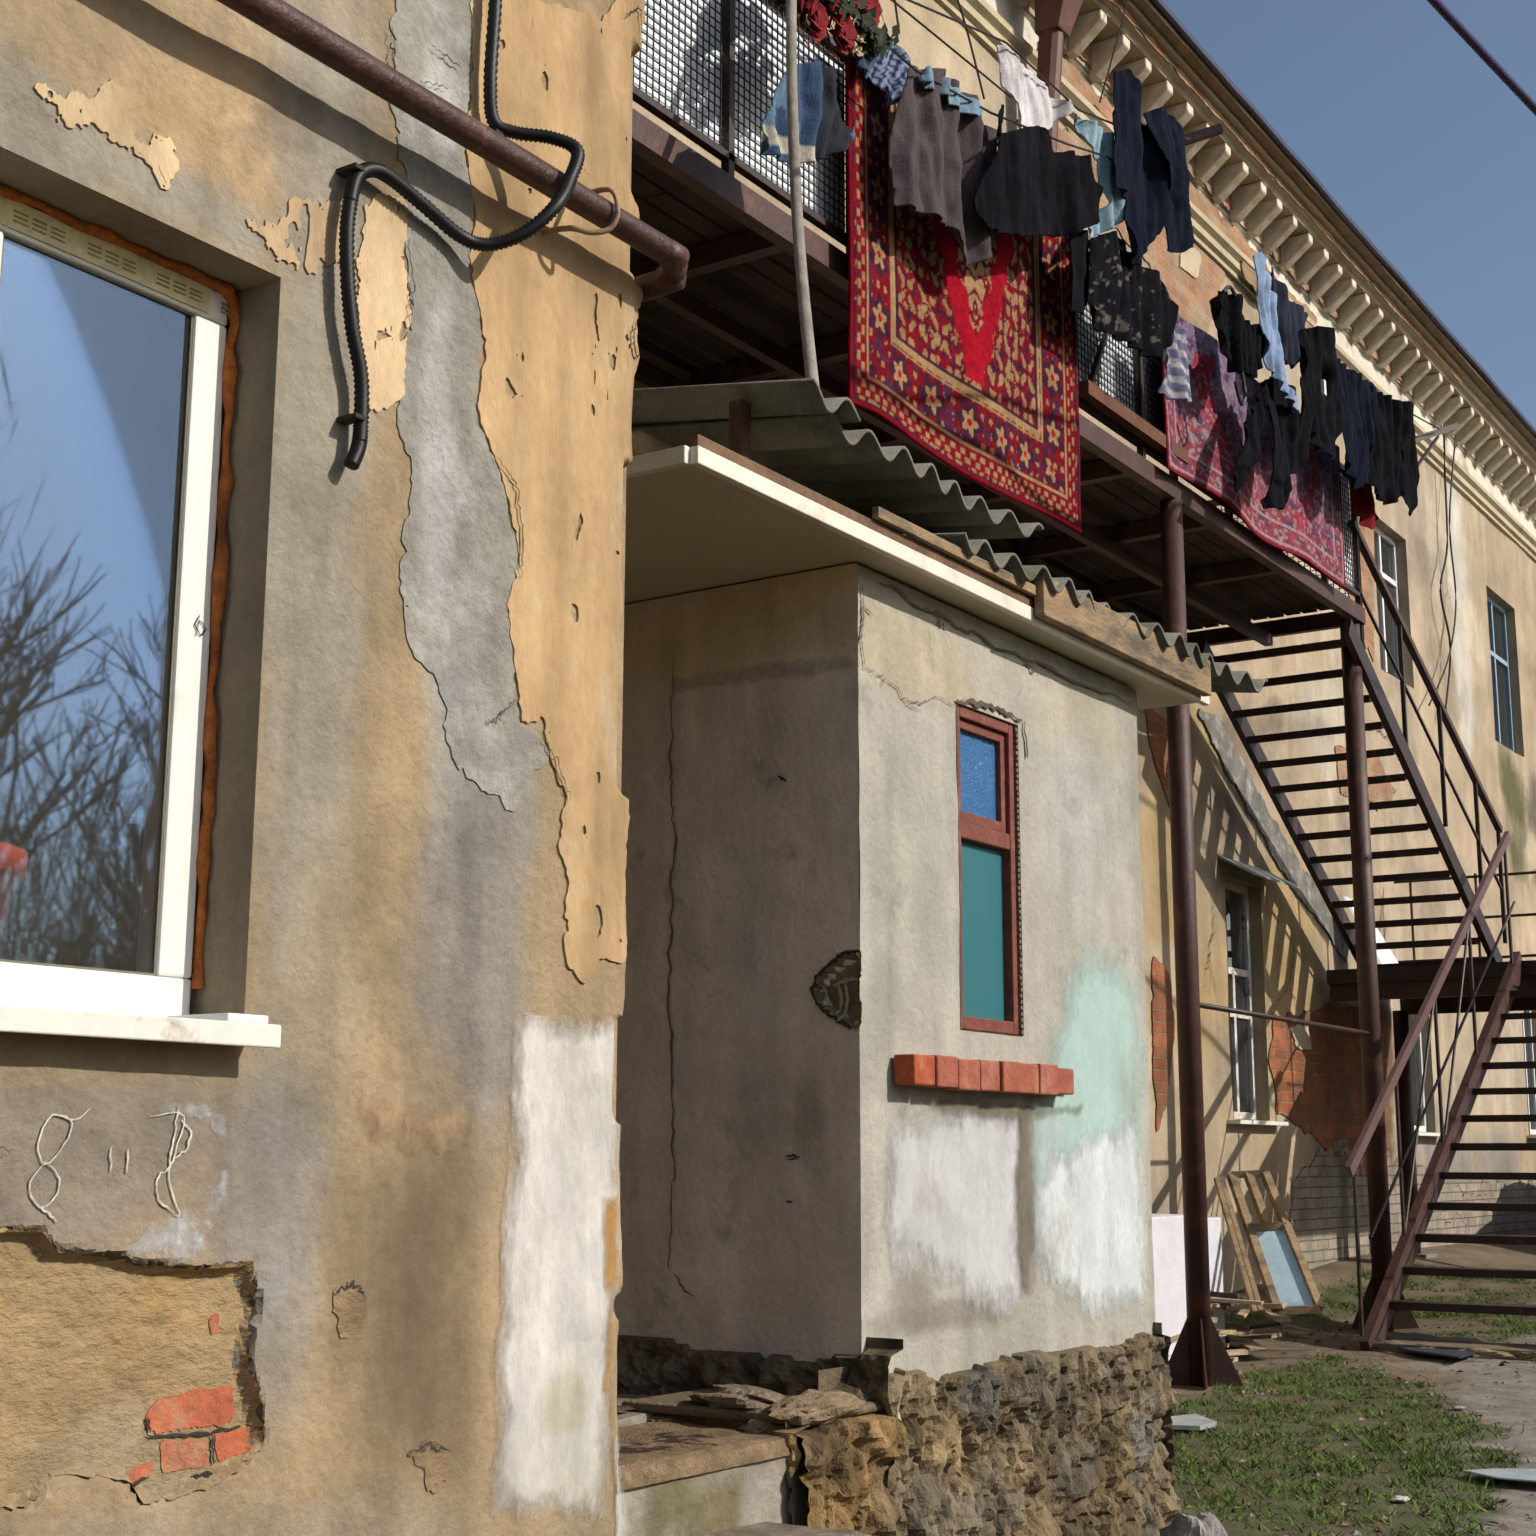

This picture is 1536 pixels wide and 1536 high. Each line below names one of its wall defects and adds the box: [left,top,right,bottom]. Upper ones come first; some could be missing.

peeling [33,79,180,190]
peeling [467,0,646,219]
peeling [245,193,412,413]
peeling [465,148,643,984]
crack [666,658,694,1298]
flaking render [1268,1002,1371,1269]
flaking render [1385,1108,1427,1251]
flaking render [1421,1179,1536,1248]
flaking render [0,1224,266,1510]